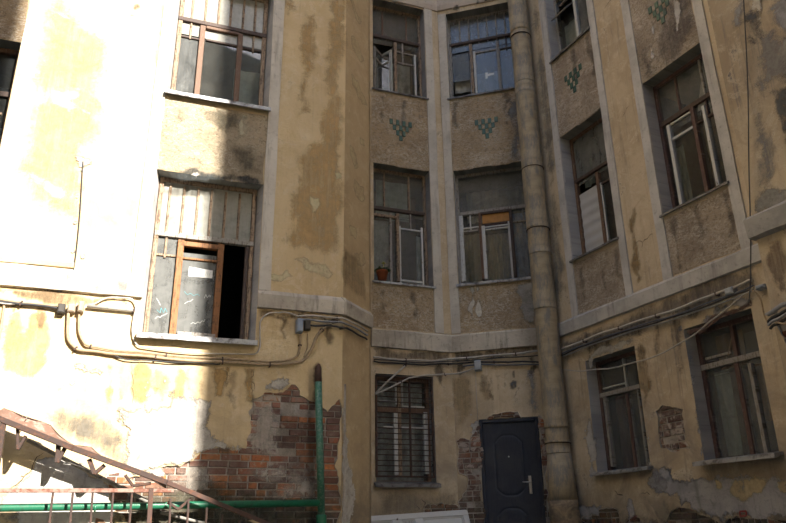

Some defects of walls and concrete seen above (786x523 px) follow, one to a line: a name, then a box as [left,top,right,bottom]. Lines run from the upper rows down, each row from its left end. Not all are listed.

leakage [23,6,102,209]
leakage [291,0,345,251]
leakage [733,0,786,140]
leakage [755,112,786,212]
leakage [0,312,49,375]
flaking render [1,380,356,523]
flaking render [417,411,522,523]
flaking render [646,405,691,453]
flaking render [649,461,786,523]